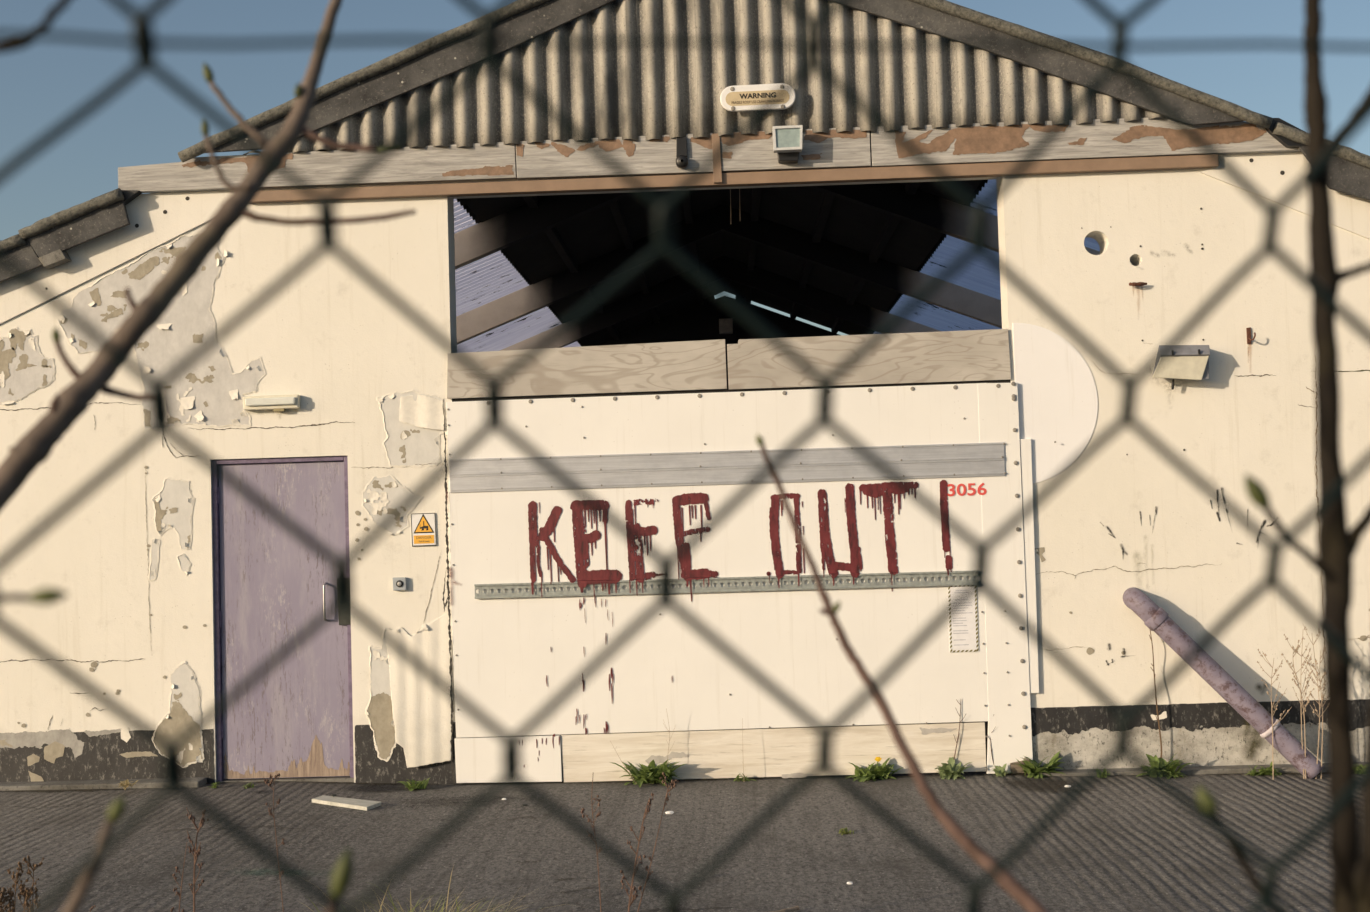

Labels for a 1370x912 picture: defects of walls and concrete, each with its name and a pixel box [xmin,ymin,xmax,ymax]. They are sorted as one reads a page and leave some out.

peeling [896,124,1087,158]
peeling [1112,124,1266,151]
peeling [0,327,56,405]
peeling [57,233,198,354]
peeling [134,246,266,430]
peeling [147,477,195,581]
peeling [355,389,447,560]
peeling [0,660,204,782]
peeling [365,628,396,762]